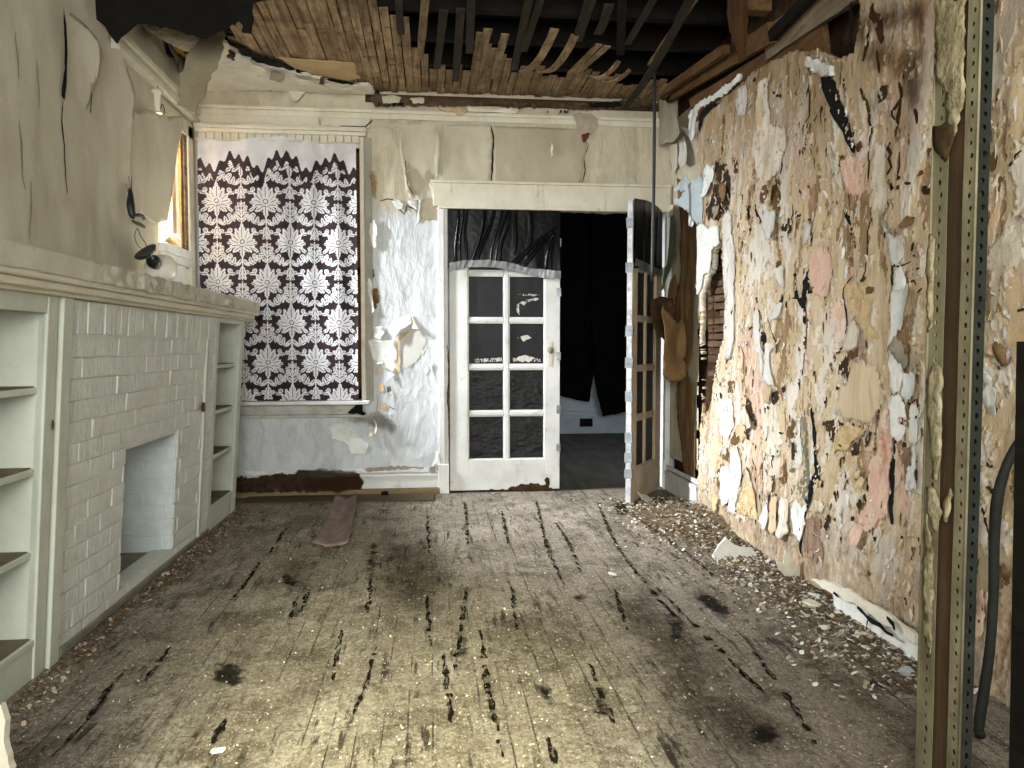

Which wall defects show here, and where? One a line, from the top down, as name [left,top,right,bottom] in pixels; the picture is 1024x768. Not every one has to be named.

peeling [61,13,183,224]
spalling [141,24,199,73]
peeling [251,64,353,101]
crack [488,126,496,181]
peeling [981,36,1024,435]
peeling [348,313,434,437]
peeling [363,48,926,623]
leakage [236,468,364,493]
peeling [977,460,995,572]
peeling [975,589,988,646]